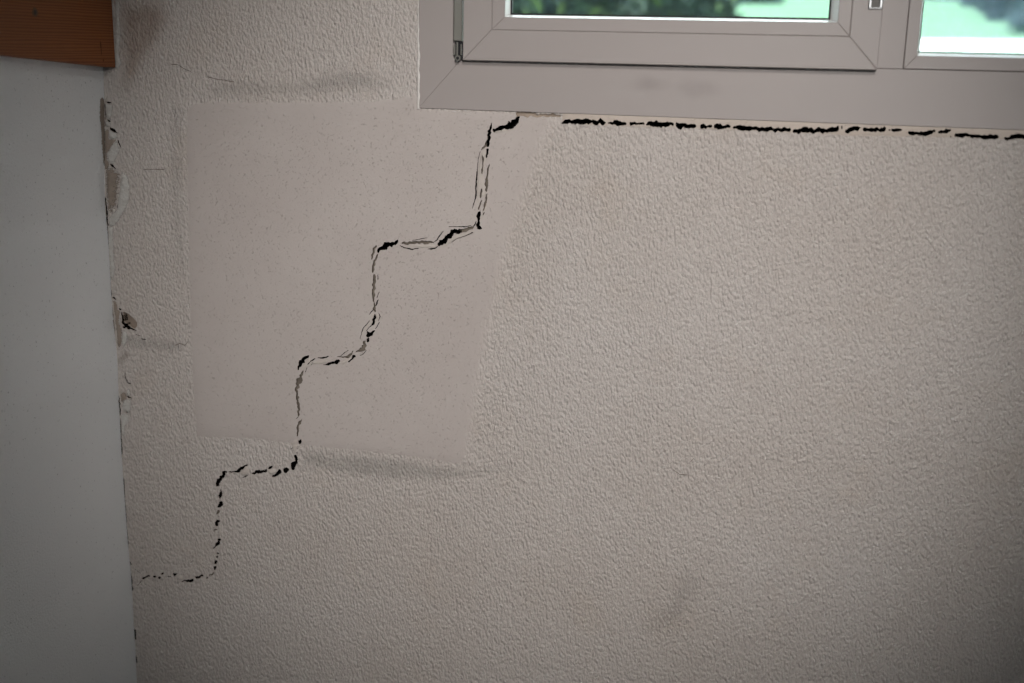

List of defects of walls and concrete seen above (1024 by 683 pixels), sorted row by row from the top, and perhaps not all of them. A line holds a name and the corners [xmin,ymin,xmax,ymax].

flaking render [99,98,121,169]
crack [103,198,111,245]
flaking render [112,297,146,347]
crack [123,112,1024,591]